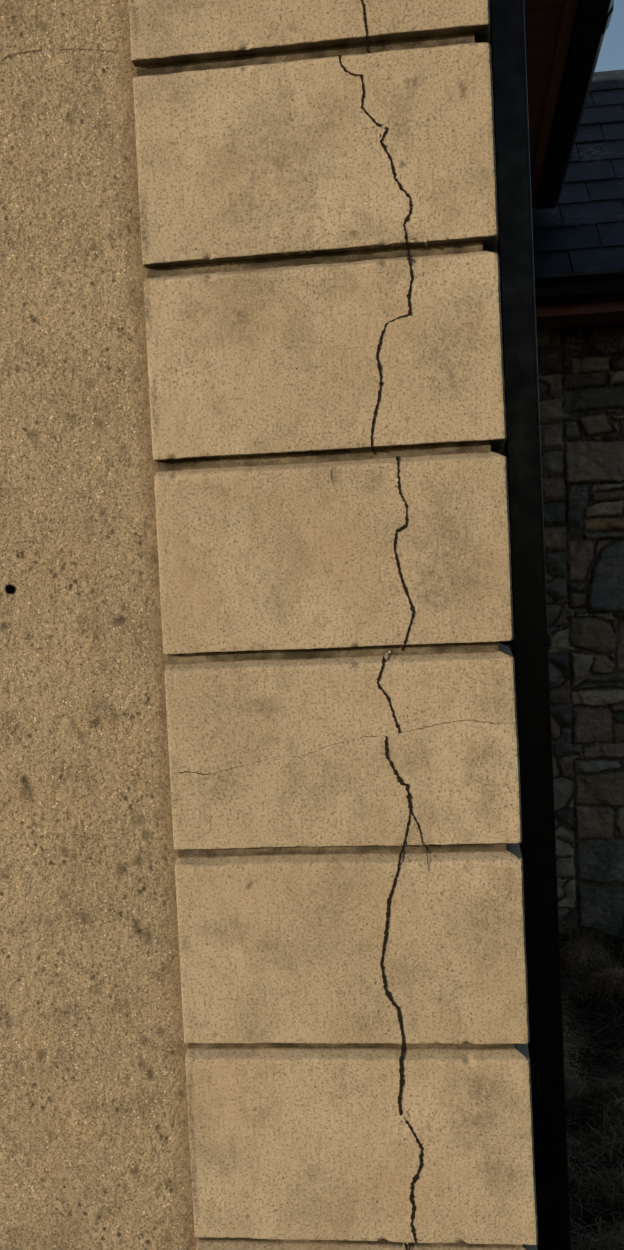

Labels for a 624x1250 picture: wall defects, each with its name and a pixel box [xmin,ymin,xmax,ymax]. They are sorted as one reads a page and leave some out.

crack [172,0,516,1250]